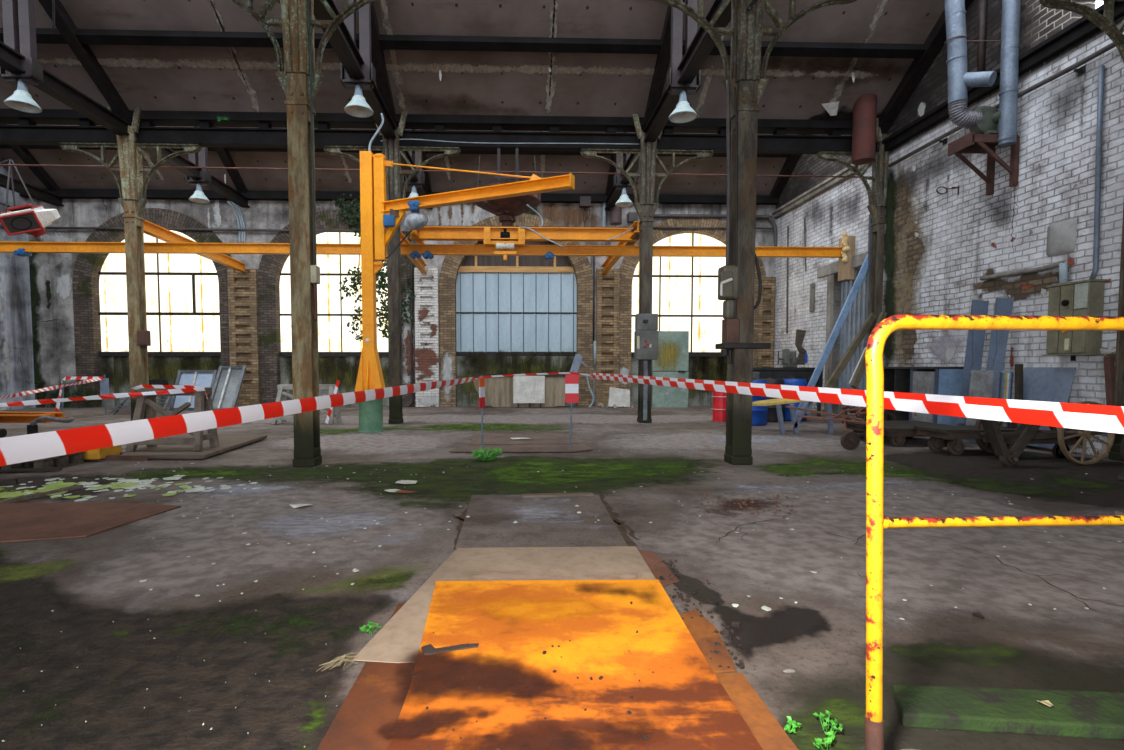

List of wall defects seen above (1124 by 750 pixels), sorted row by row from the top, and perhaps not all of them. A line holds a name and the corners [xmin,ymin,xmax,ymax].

peeling [892,166,930,315]
water stain [12,268,23,344]
spalling [971,258,1074,301]
peeling [403,290,453,406]
peeling [892,329,917,366]
water stain [37,380,47,408]